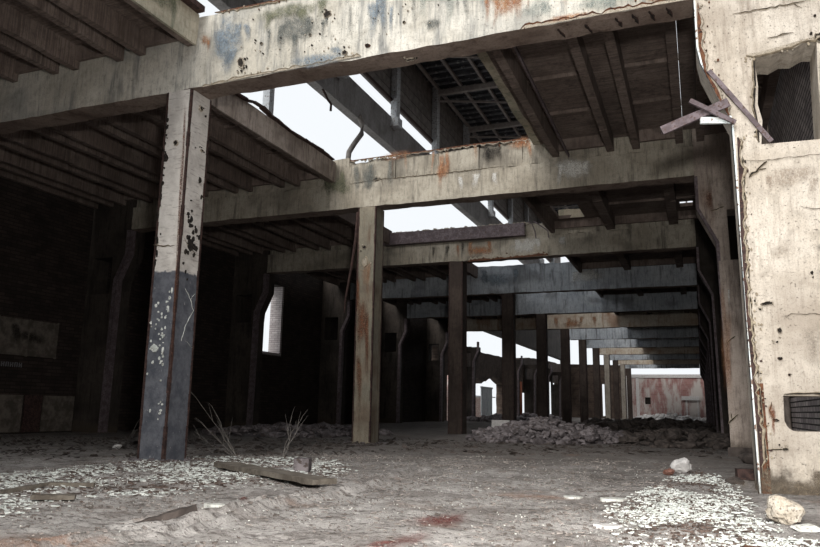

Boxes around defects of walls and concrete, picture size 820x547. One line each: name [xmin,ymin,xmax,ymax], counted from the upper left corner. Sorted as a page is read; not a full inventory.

leakage [215,19,250,64]
leakage [266,9,312,47]
corrosion [485,0,521,12]
peeling [182,195,203,280]
peeling [149,287,173,366]
corrosion [756,383,775,494]